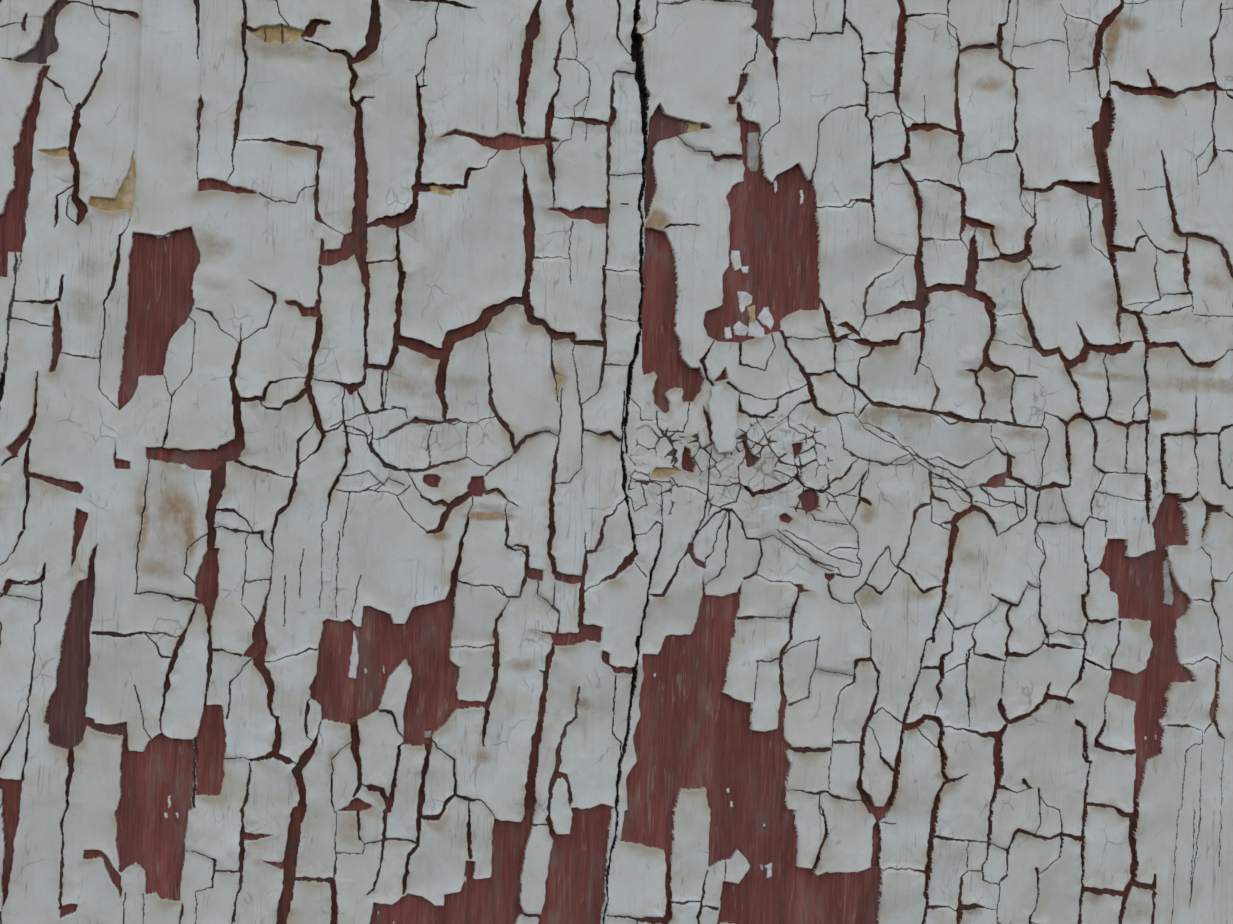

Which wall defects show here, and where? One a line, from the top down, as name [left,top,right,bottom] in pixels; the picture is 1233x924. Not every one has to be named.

crack [0,438,84,781]
crack [12,215,131,407]
crack [45,0,139,228]
crack [58,747,145,924]
peeling [44,509,227,901]
peeling [118,227,200,410]
crack [92,0,690,924]
peeling [309,579,486,746]
peeling [538,582,883,924]
peeling [703,0,821,343]
crack [639,0,1233,924]
peeling [1097,493,1224,808]